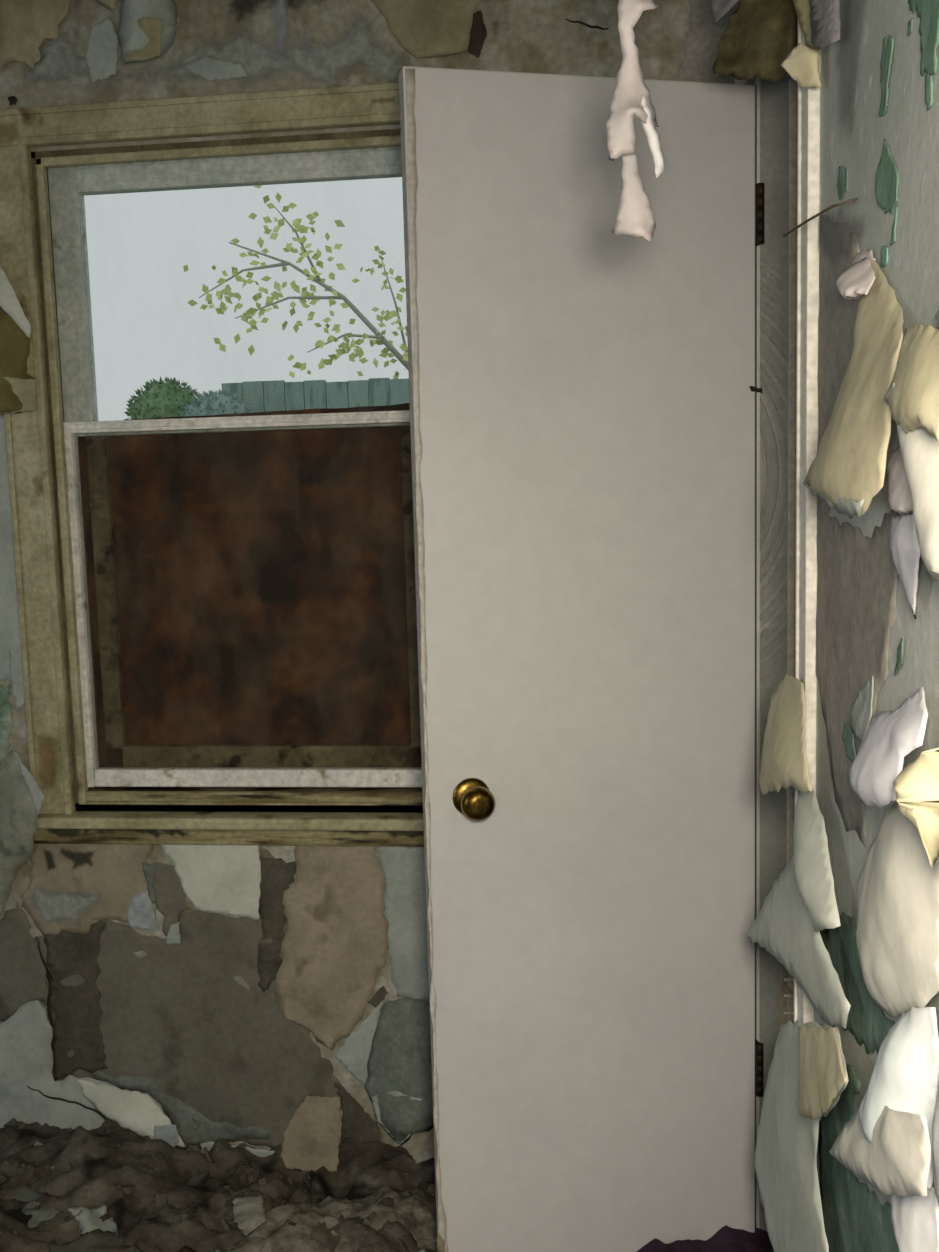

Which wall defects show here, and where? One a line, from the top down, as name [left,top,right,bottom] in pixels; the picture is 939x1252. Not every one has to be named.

peeling [85,18,119,82]
peeling [134,18,403,81]
peeling [879,0,939,117]
flaking render [817,139,899,449]
flaking render [815,496,905,847]
flaking render [0,414,416,1167]
peeling [377,846,429,1000]
flaking render [778,964,794,1030]
peeling [820,912,895,1054]
peeling [818,1065,899,1252]